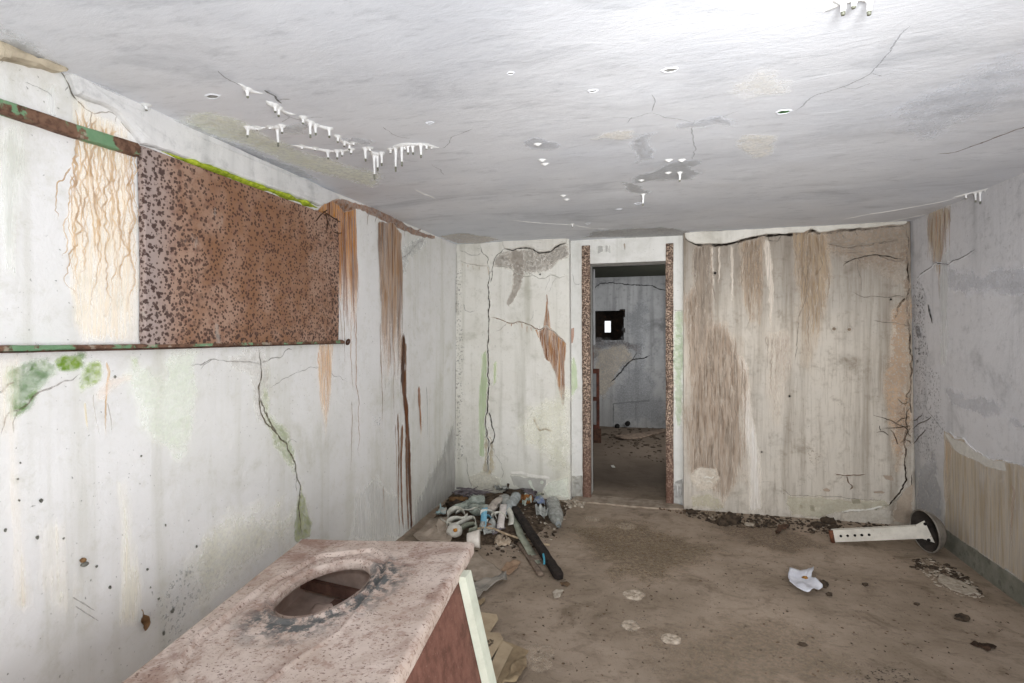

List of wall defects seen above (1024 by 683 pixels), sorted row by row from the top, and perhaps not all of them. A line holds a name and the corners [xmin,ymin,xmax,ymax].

damp [193,83,439,182]
damp [55,139,139,299]
damp [793,188,988,338]
crack [258,352,302,534]
corrosion [316,199,435,528]
crack [480,243,566,477]
corrosion [539,295,574,404]
damp [674,238,774,510]
crack [655,225,975,514]
peeling [938,574,978,595]
flaking render [944,430,1024,583]